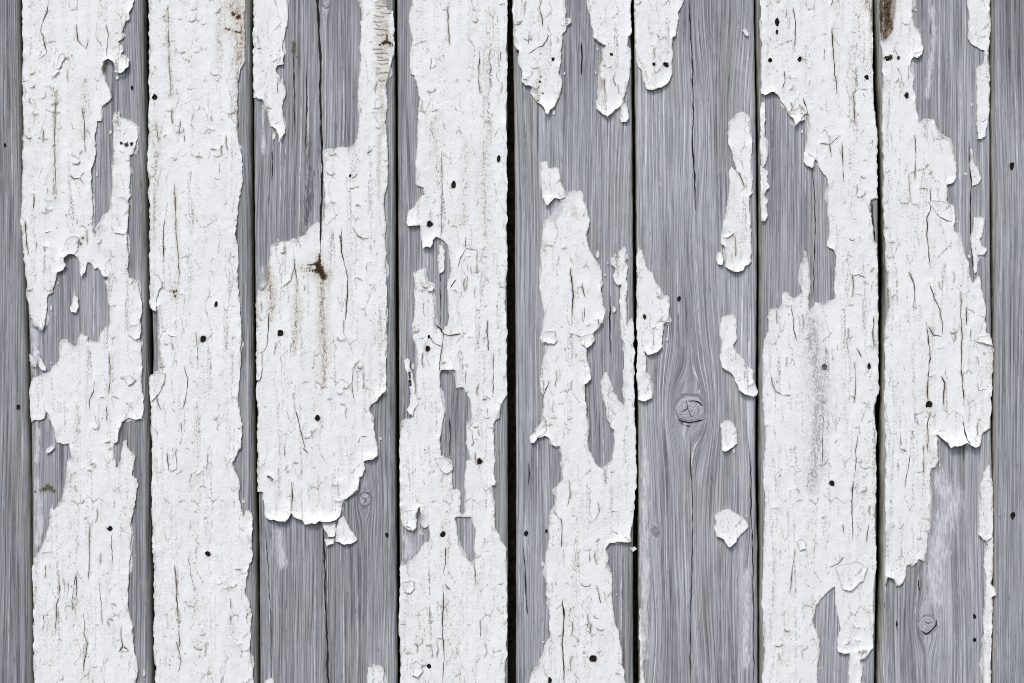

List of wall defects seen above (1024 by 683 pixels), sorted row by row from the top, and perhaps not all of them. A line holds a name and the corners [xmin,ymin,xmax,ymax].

peeling [20,0,571,683]
corrosion [301,253,328,383]
peeling [529,161,672,683]
peeling [586,0,684,122]
peeling [714,0,996,683]